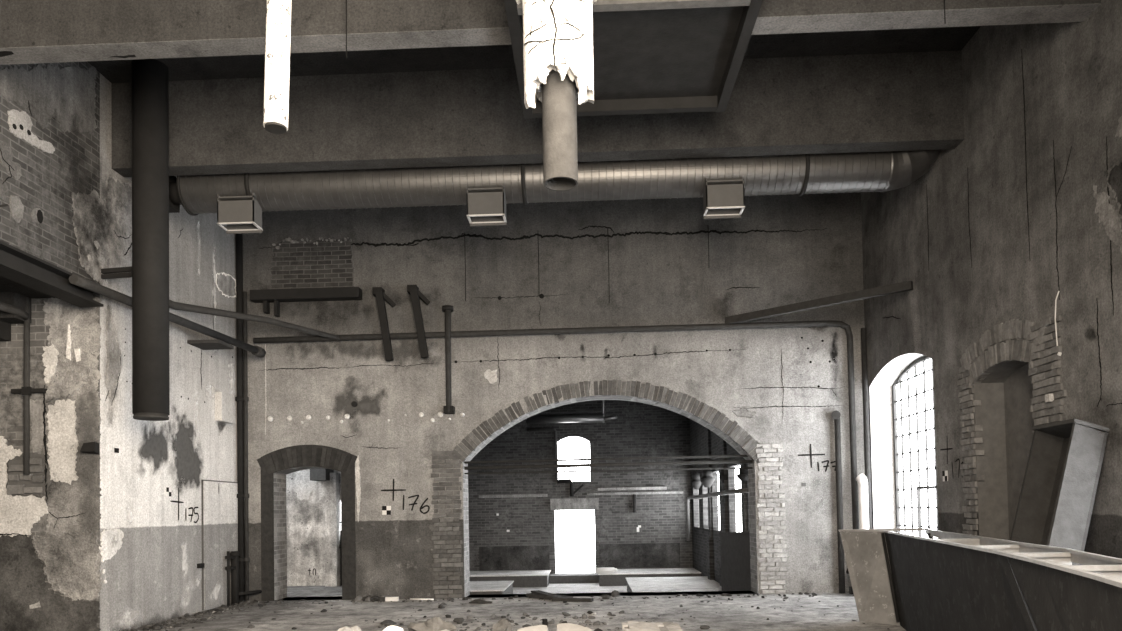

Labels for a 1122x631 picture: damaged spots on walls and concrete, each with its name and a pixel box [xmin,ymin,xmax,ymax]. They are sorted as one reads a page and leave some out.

flaking render [1106,159,1122,222]
crack [351,226,827,247]
damp [334,379,384,431]
damp [139,408,202,492]